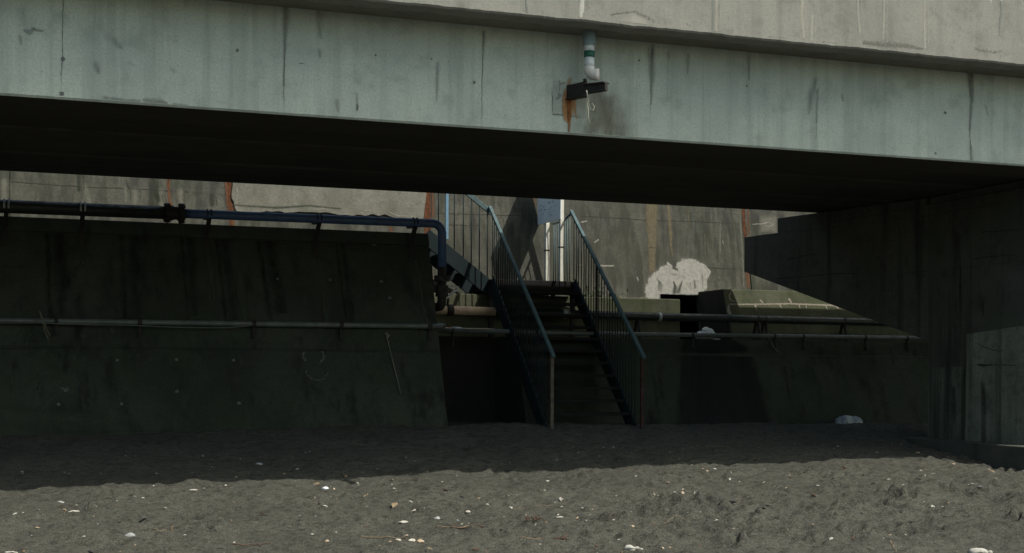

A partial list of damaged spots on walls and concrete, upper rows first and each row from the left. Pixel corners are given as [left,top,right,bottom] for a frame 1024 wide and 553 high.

rust [563,80,577,132]
rust [225,182,235,226]